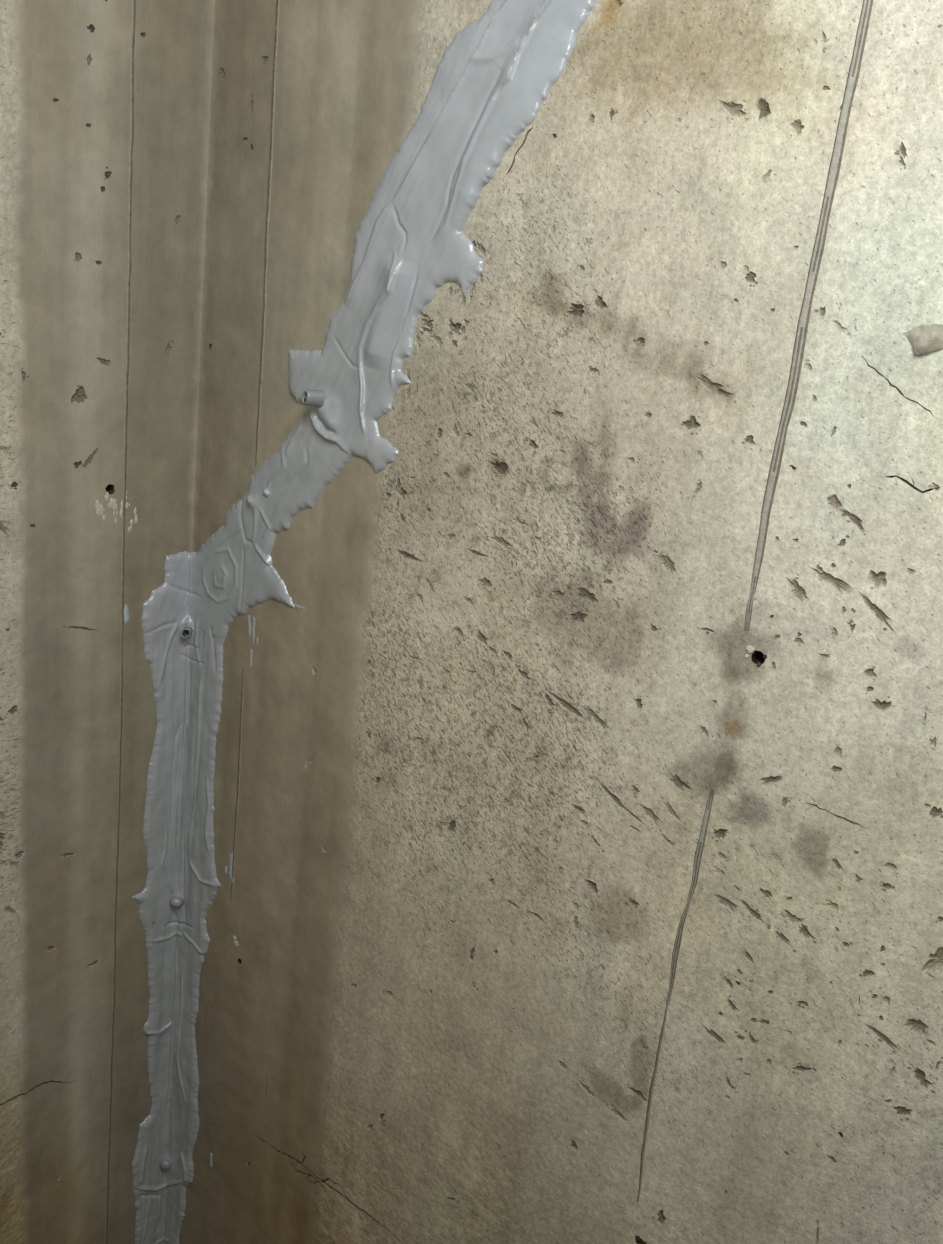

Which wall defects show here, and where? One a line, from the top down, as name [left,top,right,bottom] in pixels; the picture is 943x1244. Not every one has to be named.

crack [0,1080,77,1105]
crack [255,1135,403,1244]